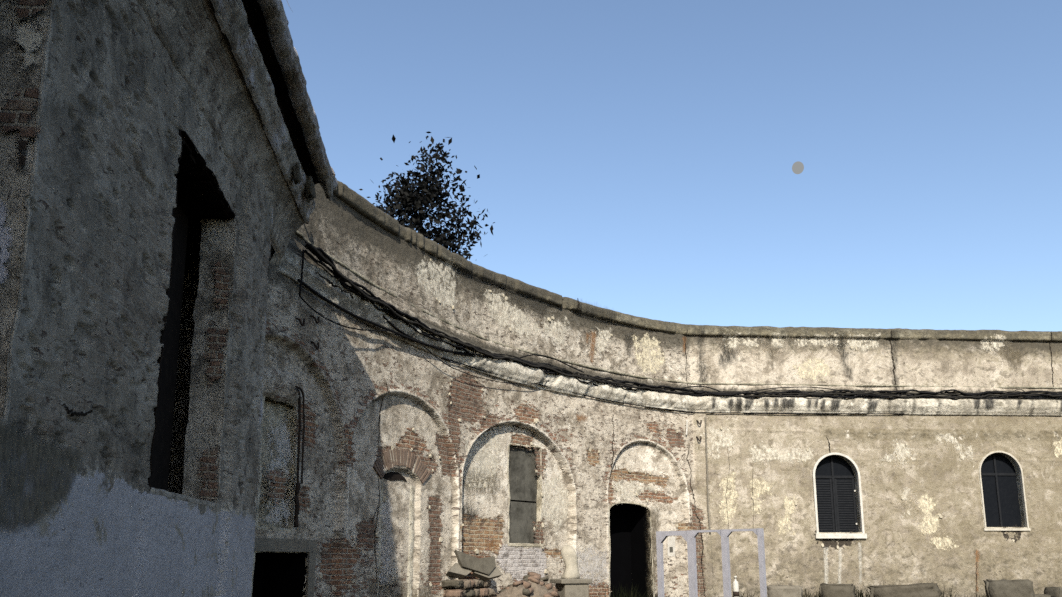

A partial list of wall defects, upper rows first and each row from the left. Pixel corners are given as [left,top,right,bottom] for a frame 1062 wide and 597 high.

flaking render [16,27,44,69]
spalling [17,140,28,166]
flaking render [0,199,13,284]
flaking render [203,324,230,388]
leakage [0,421,82,531]
flaking render [195,445,219,501]
flaking render [264,400,321,526]
flaking render [376,371,576,589]
flaking render [318,496,394,595]
flaking render [576,548,612,597]